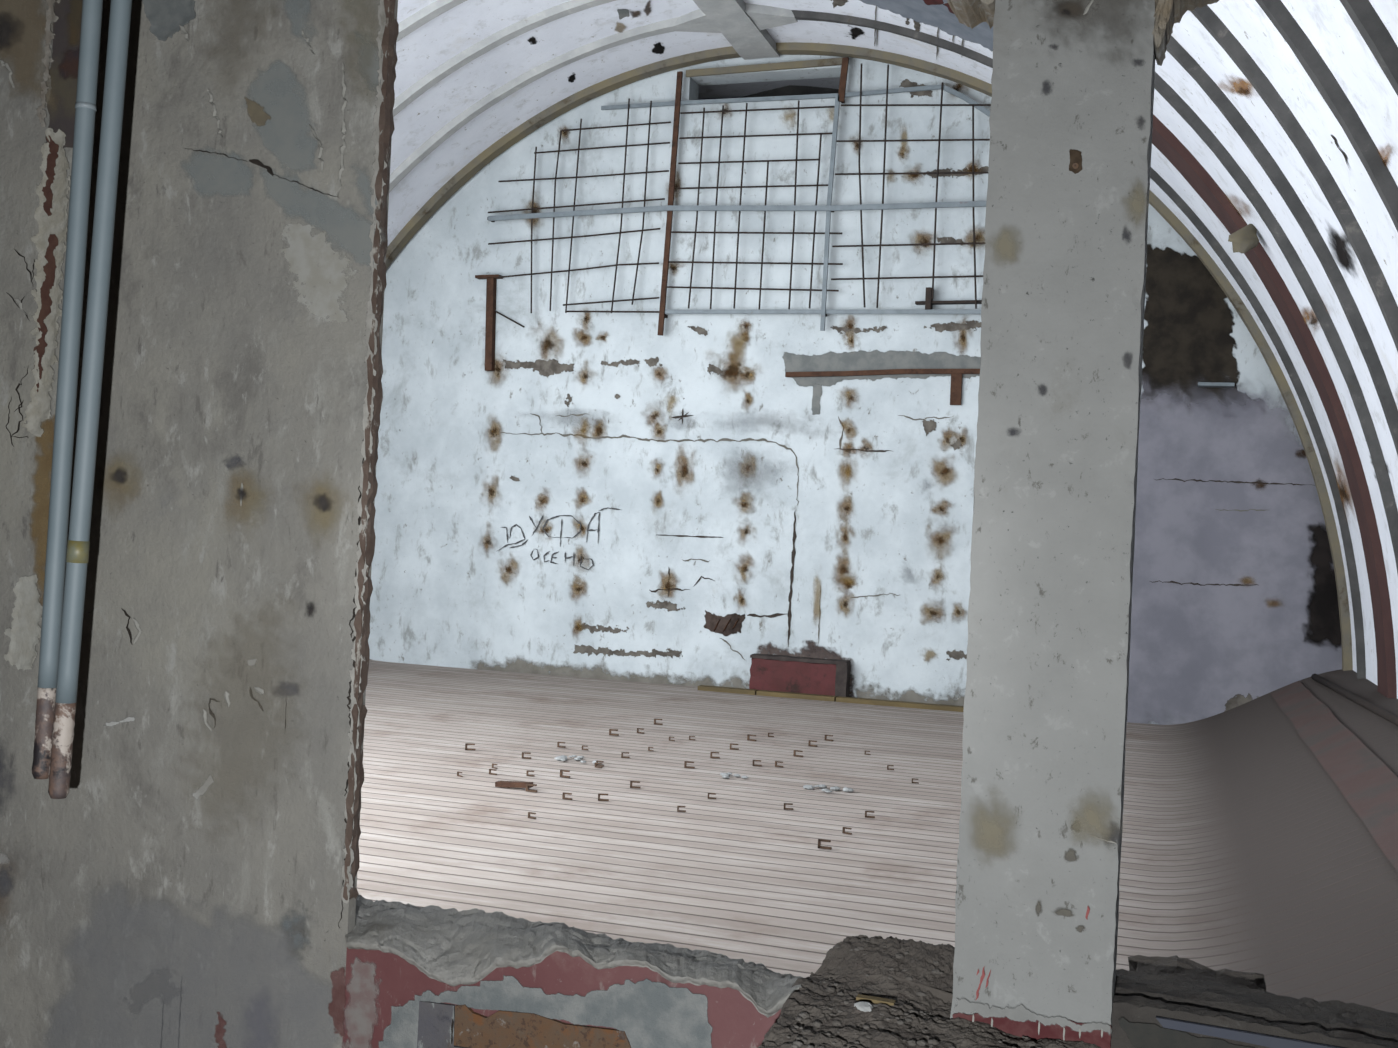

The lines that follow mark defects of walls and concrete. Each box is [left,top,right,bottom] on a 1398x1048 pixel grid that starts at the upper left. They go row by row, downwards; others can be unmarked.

leakage [0,0,52,102]
peeling [615,1,651,33]
spalling [652,42,665,54]
crack [185,148,339,198]
crack [7,250,35,320]
crack [6,368,28,447]
rust [721,322,755,405]
rust [785,369,980,405]
peeling [281,0,389,904]
rust [932,430,966,514]
rust [836,421,872,614]
flaking render [4,574,43,671]